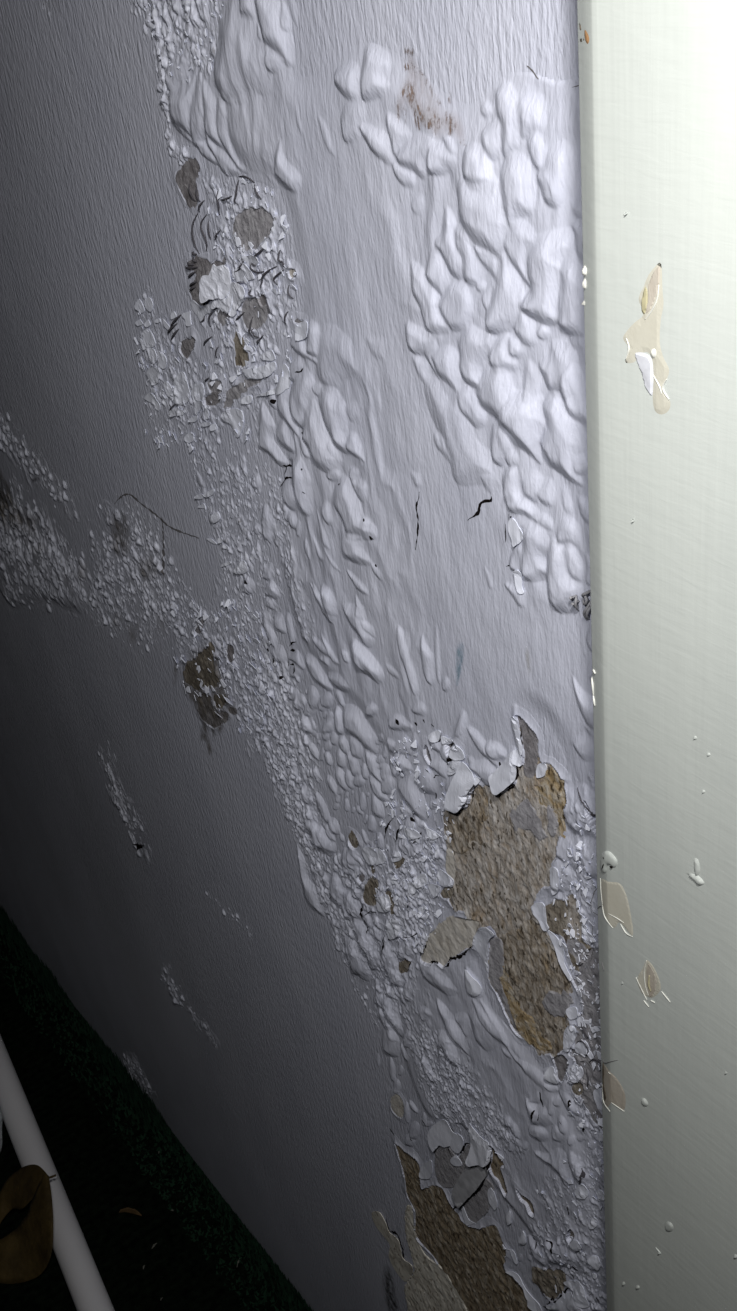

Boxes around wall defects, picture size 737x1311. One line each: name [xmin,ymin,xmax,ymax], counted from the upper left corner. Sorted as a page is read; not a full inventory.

peeling [125,0,219,216]
peeling [623,265,671,415]
spalling [0,169,626,1311]
peeling [600,878,633,937]